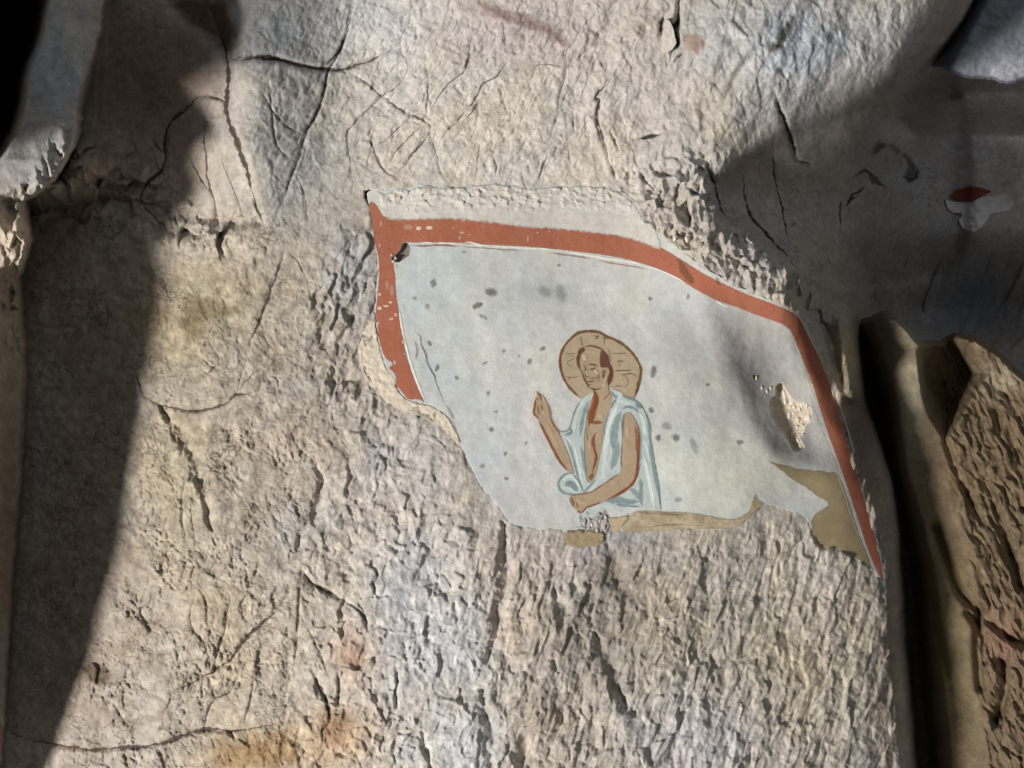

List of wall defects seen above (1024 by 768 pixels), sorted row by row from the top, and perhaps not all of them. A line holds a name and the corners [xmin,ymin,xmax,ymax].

flaking render [391,242,411,269]
peeling [358,293,460,444]
flaking render [753,375,812,452]
peeling [564,510,628,549]